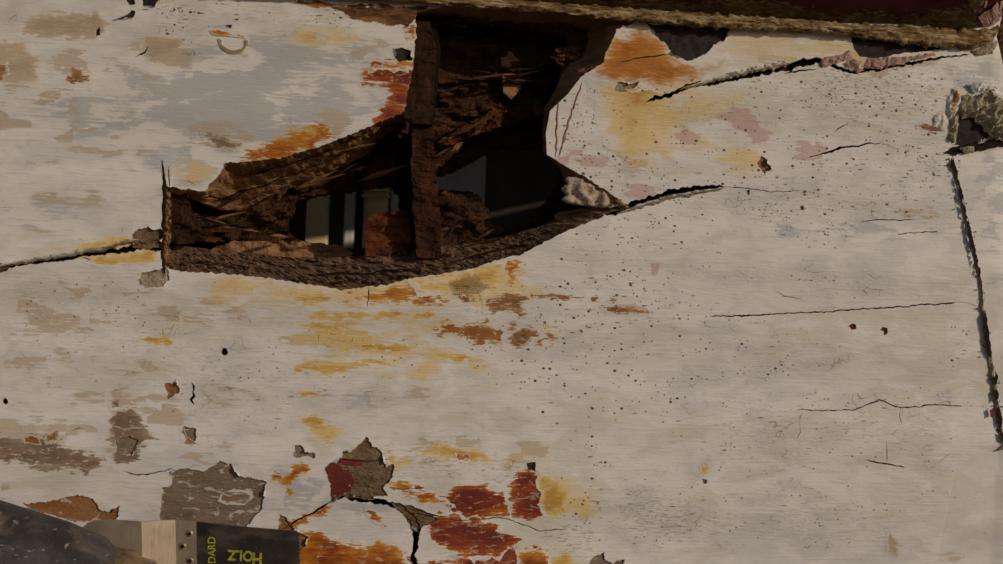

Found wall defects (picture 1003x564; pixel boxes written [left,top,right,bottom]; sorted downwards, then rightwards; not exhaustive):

corrosion [357,53,414,127]
peeling [393,48,413,62]
corrosion [578,18,732,179]
crack [647,54,969,102]
crack [605,185,796,216]
crack [0,239,161,272]
crack [709,139,1003,440]
peeling [294,445,315,458]
peeling [160,461,267,527]
peeling [324,437,441,534]
corrosion [287,449,579,564]
peeling [589,553,624,564]